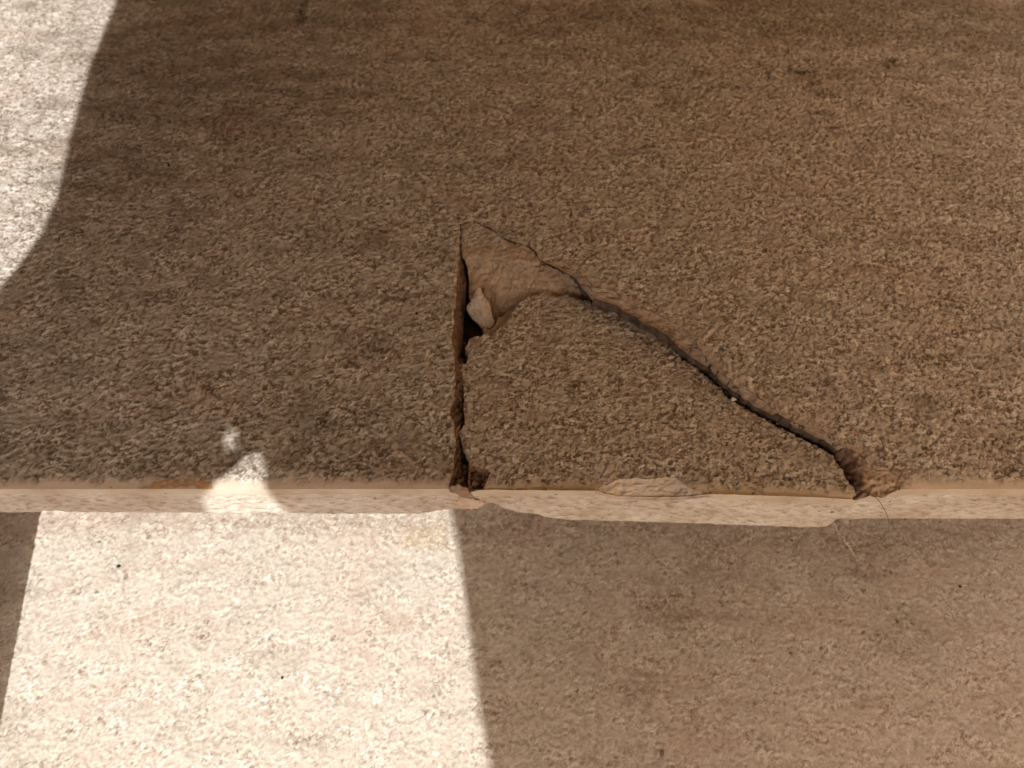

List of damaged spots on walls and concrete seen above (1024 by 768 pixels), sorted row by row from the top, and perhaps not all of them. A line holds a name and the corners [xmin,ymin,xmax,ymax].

crack [443,219,538,498]
spalling [454,221,902,527]
crack [583,287,844,474]